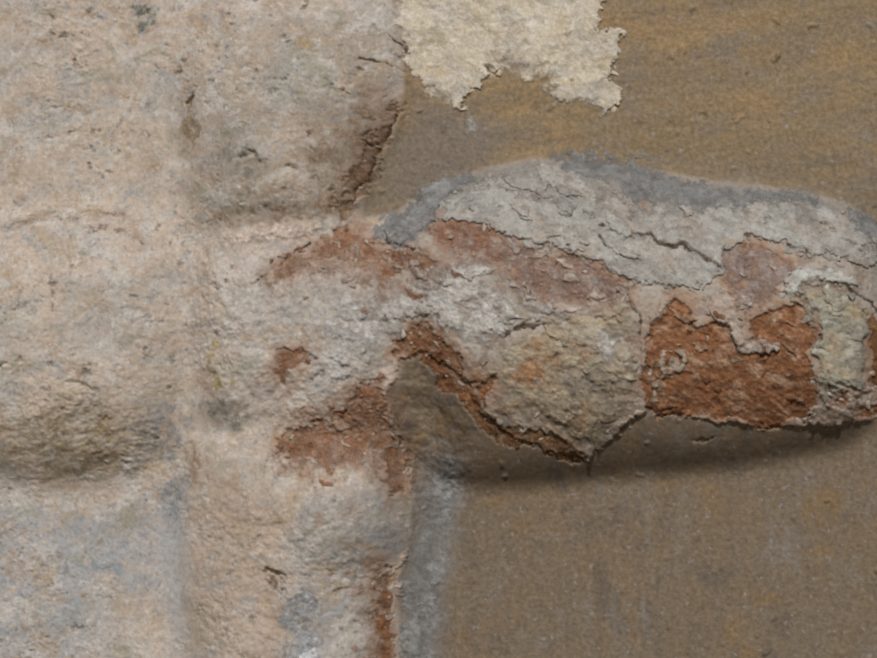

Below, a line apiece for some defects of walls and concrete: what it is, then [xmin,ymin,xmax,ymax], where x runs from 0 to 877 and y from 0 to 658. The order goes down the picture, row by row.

flaking render [393,0,627,132]
crack [353,114,398,203]
crack [583,212,609,248]
crack [639,233,721,268]
flaking render [317,160,877,463]
spalling [275,341,317,382]
spalling [277,357,418,498]